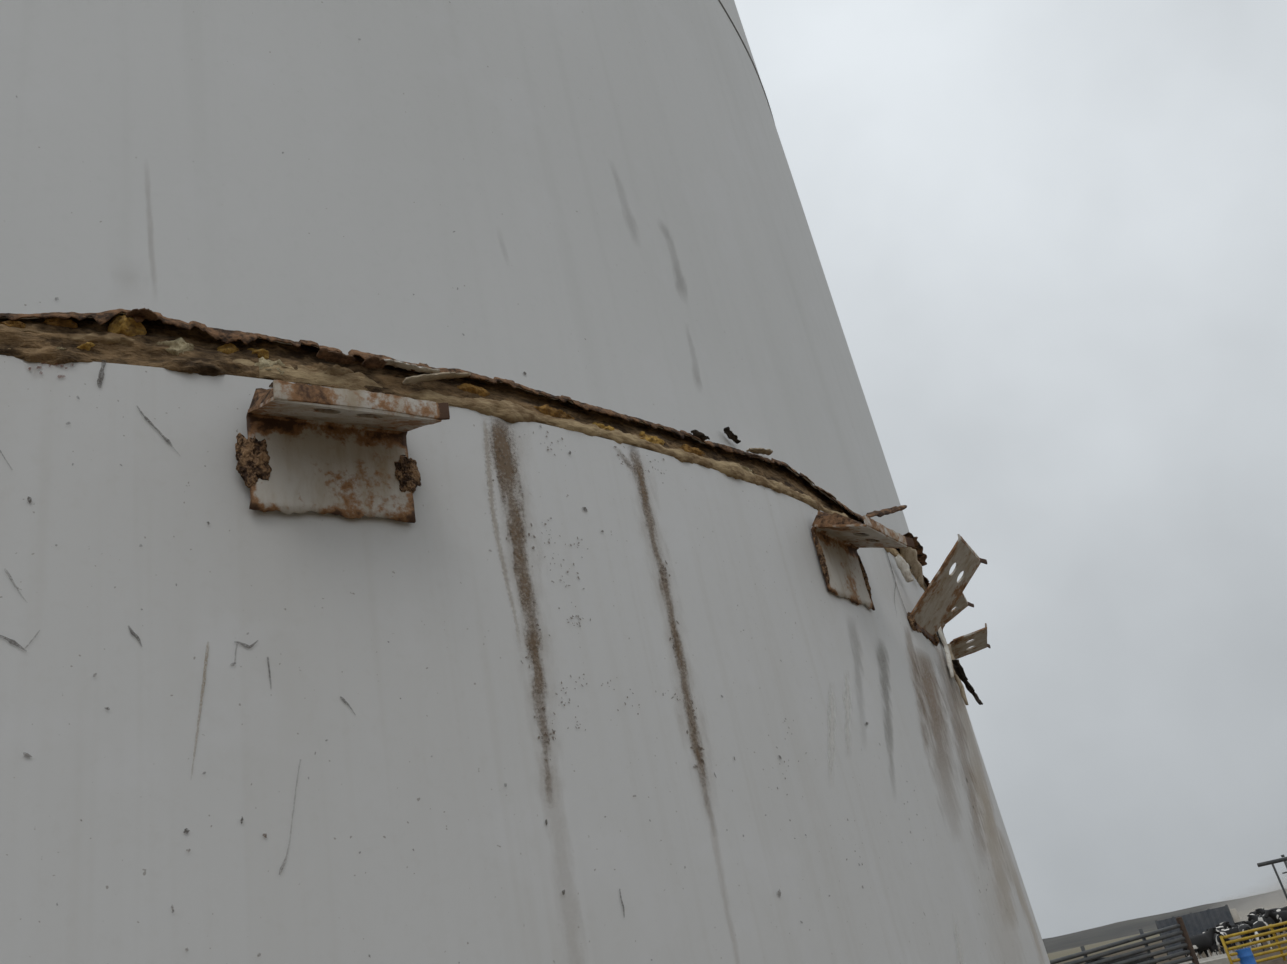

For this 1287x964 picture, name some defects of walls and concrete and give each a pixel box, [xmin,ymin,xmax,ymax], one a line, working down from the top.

peeling [126,308,158,321]
peeling [316,347,471,384]
peeling [691,427,773,455]
peeling [866,505,907,518]
peeling [895,532,927,586]
peeling [938,626,983,705]